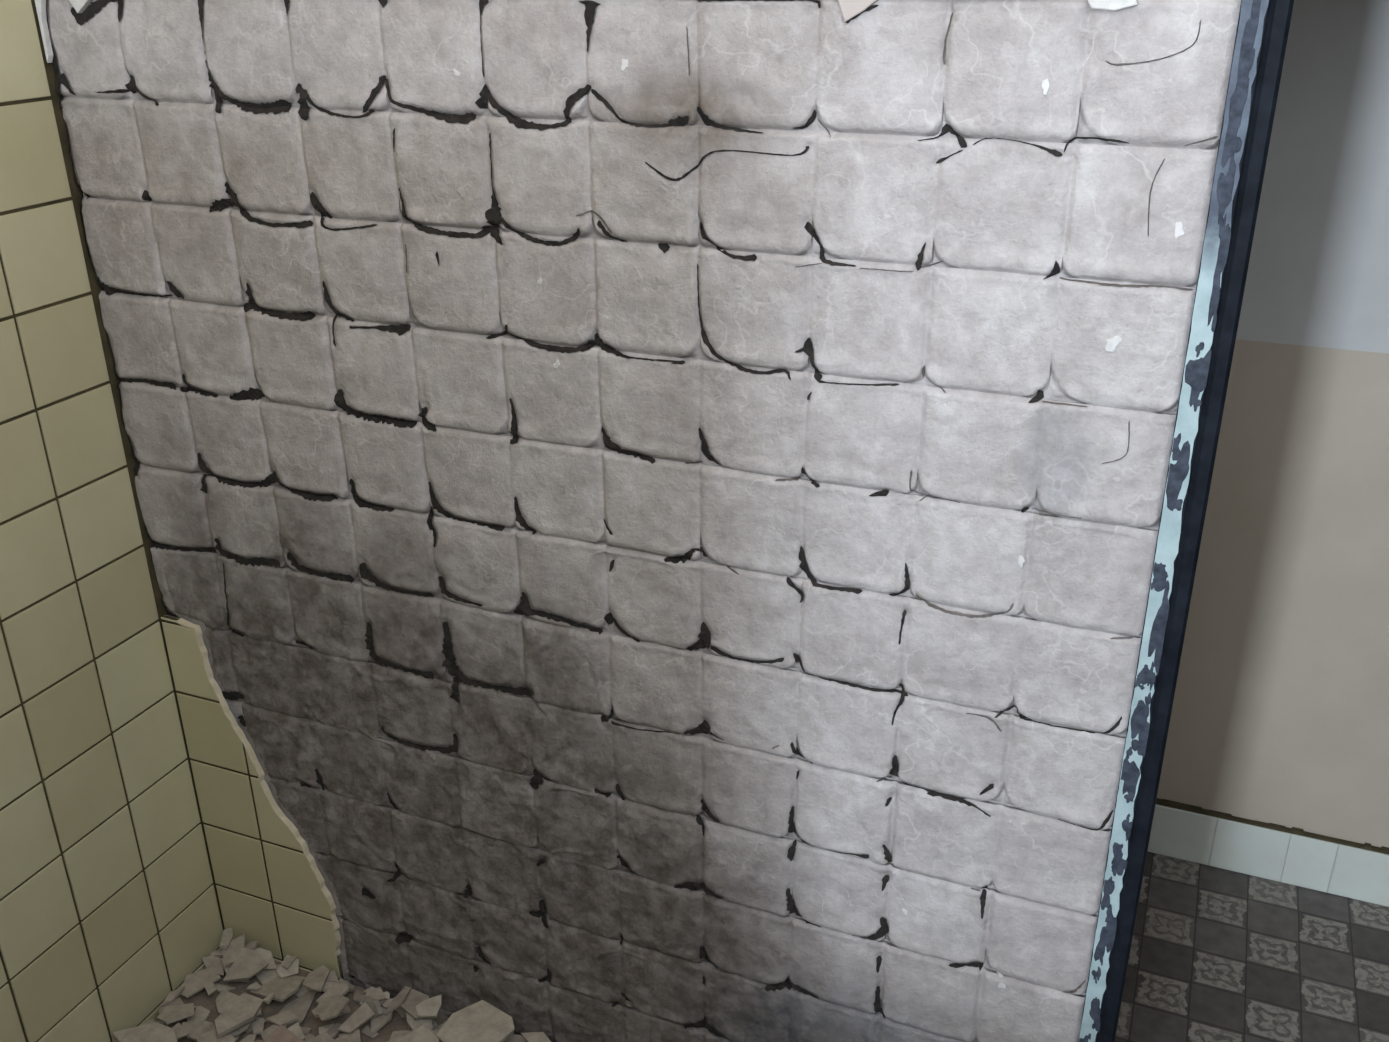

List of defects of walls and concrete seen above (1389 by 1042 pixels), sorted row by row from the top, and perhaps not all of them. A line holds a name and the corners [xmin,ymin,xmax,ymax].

crack [46,0,184,299]
spalling [286,0,387,116]
spalling [480,0,587,125]
crack [198,0,946,400]
peeling [838,0,878,22]
peeling [1166,433,1190,511]
spalling [160,615,344,980]
crack [144,482,640,754]
crack [765,742,892,1019]
crack [687,622,994,817]
crack [786,546,1014,645]
peeling [1147,580,1170,691]